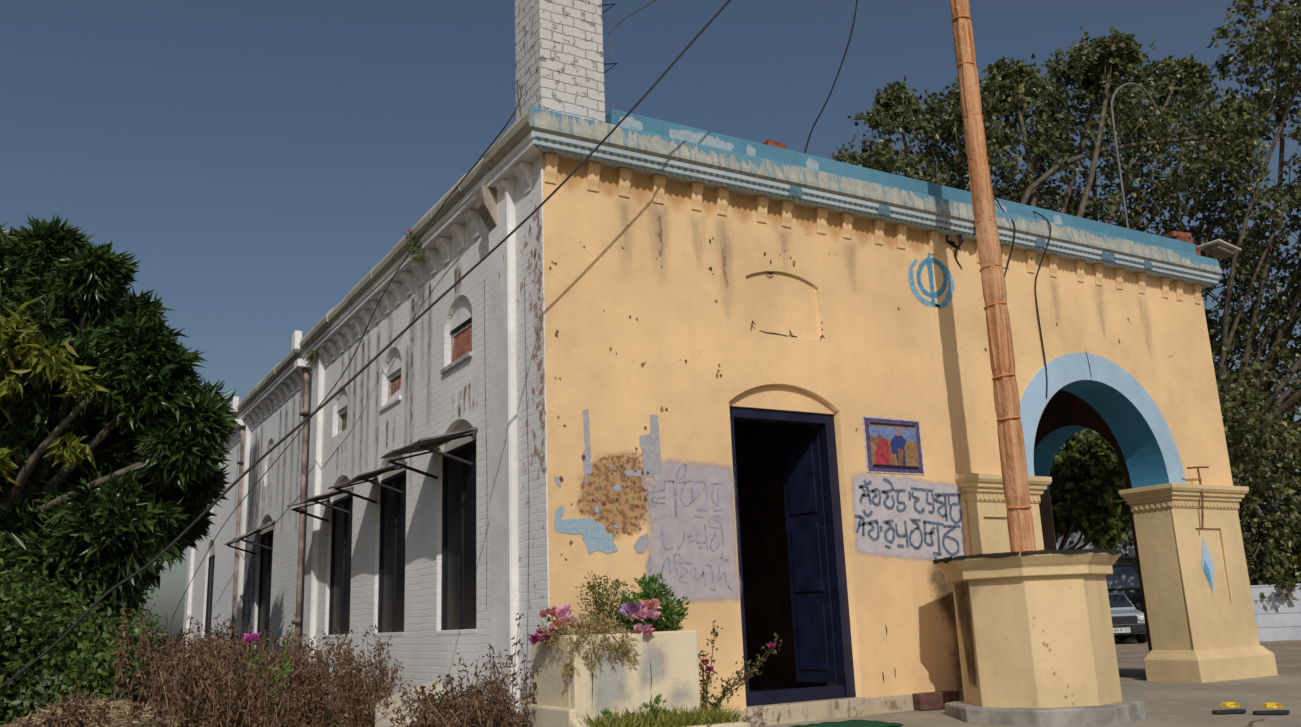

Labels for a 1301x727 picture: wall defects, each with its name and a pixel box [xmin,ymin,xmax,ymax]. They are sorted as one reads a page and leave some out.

peeling [619,115,643,131]
peeling [669,129,756,156]
peeling [520,205,566,488]
peeling [554,407,668,561]